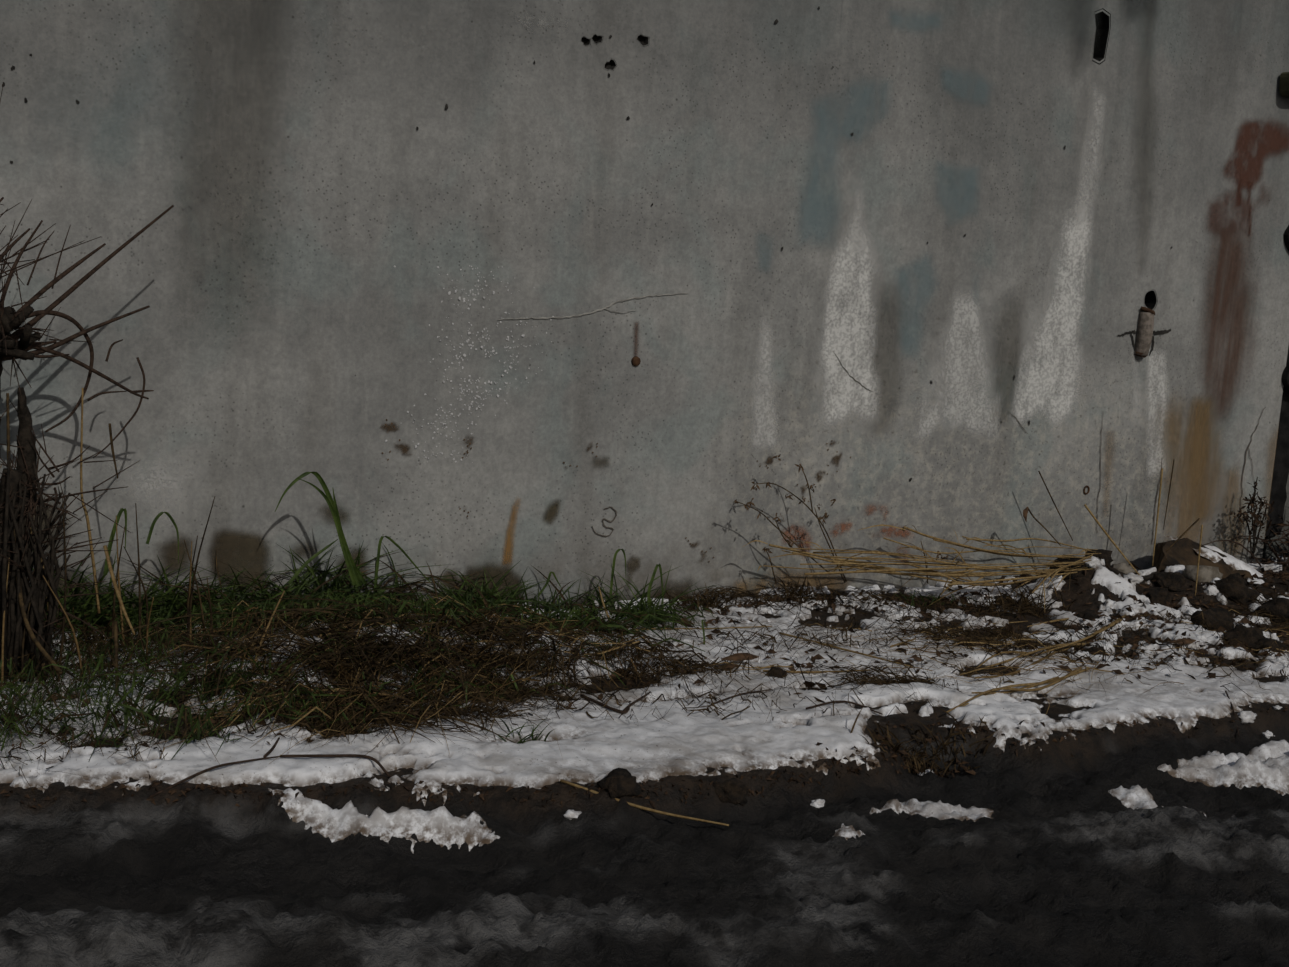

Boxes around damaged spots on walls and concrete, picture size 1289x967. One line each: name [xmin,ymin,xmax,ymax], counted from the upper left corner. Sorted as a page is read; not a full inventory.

spalling [581,35,612,46]
water stain [754,330,775,446]
water stain [821,196,896,428]
water stain [919,99,1102,434]
corrosion [1169,233,1247,541]
corrosion [504,507,515,564]